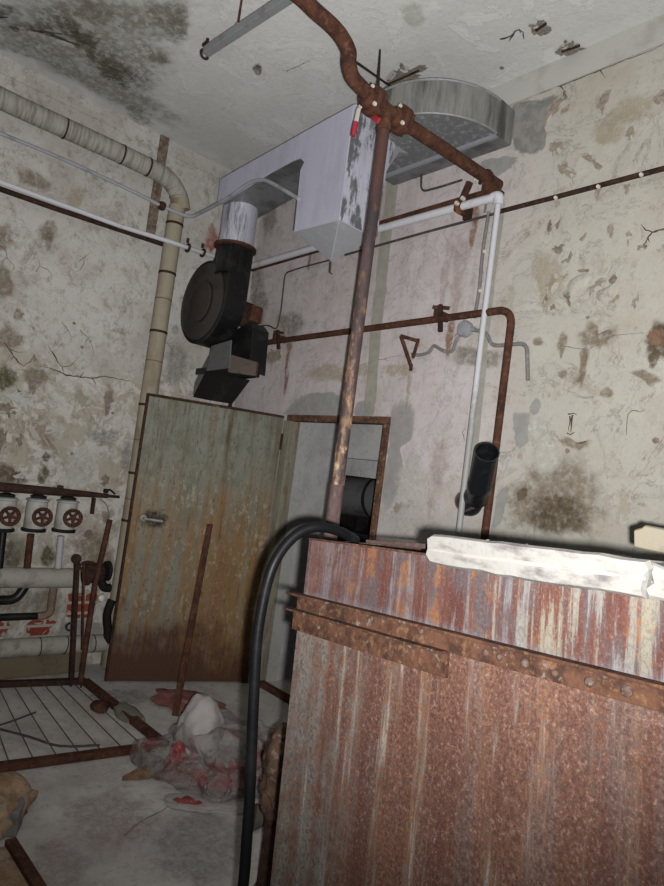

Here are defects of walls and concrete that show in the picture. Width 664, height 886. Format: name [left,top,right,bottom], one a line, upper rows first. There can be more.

water stain [3,0,185,124]
spalling [528,20,552,36]
spalling [554,40,586,56]
crack [642,226,664,245]
crack [4,322,127,385]
water stain [514,418,593,532]